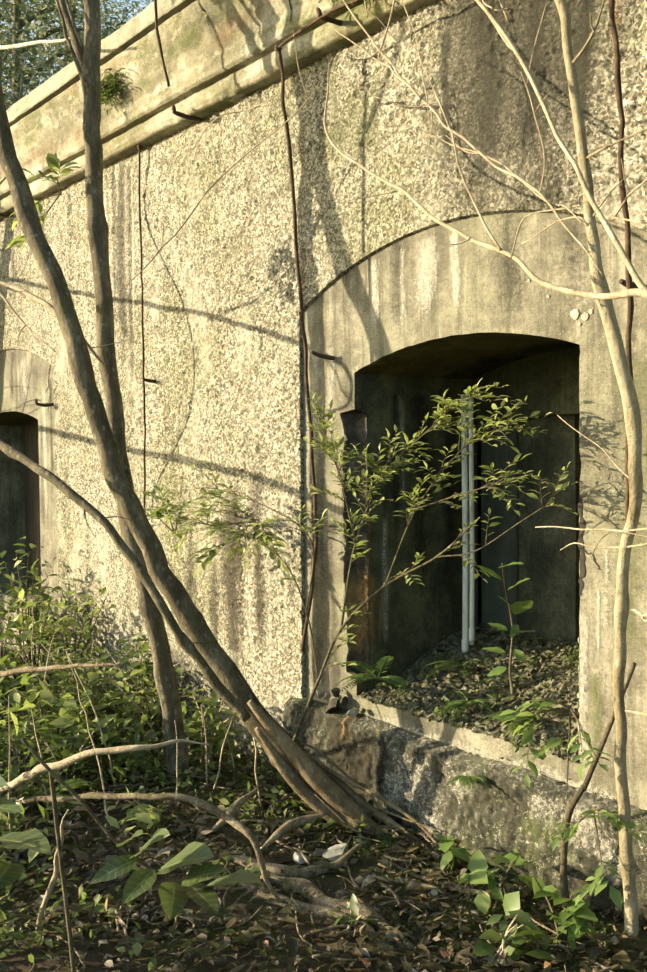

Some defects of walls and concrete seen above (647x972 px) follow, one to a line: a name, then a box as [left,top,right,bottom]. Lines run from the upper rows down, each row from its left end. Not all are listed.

water stain [104,164,135,372]
water stain [418,240,437,304]
water stain [441,342,579,379]
water stain [209,563,217,638]
water stain [237,475,271,643]
corrosion [346,514,383,652]